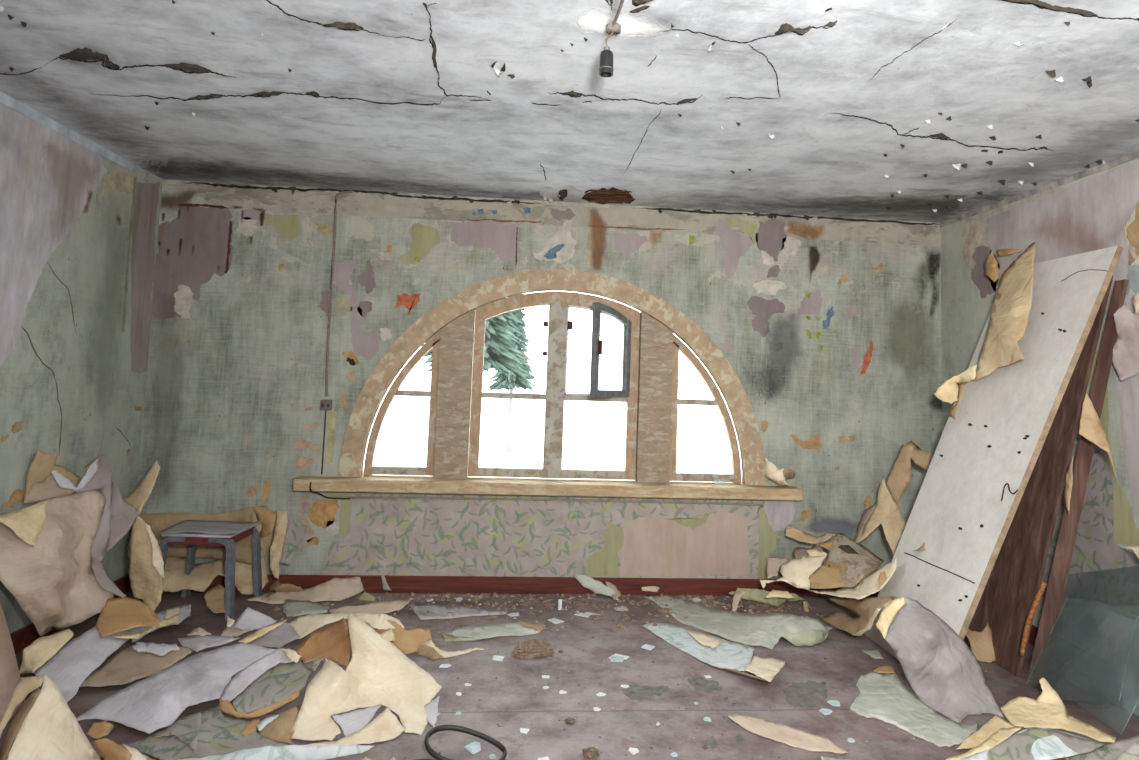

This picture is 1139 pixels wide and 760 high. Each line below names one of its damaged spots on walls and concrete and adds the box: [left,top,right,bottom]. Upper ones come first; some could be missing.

crack [0,0,491,106]
flaking render [561,10,679,52]
crack [1002,0,1139,21]
crack [532,0,837,175]
crack [832,113,1053,154]
flaking render [174,284,193,319]
flaking render [533,220,594,268]
corrosion [591,211,604,269]
flaking render [753,224,802,296]
damp [920,254,940,315]
damp [755,318,797,391]
peeling [619,510,750,578]